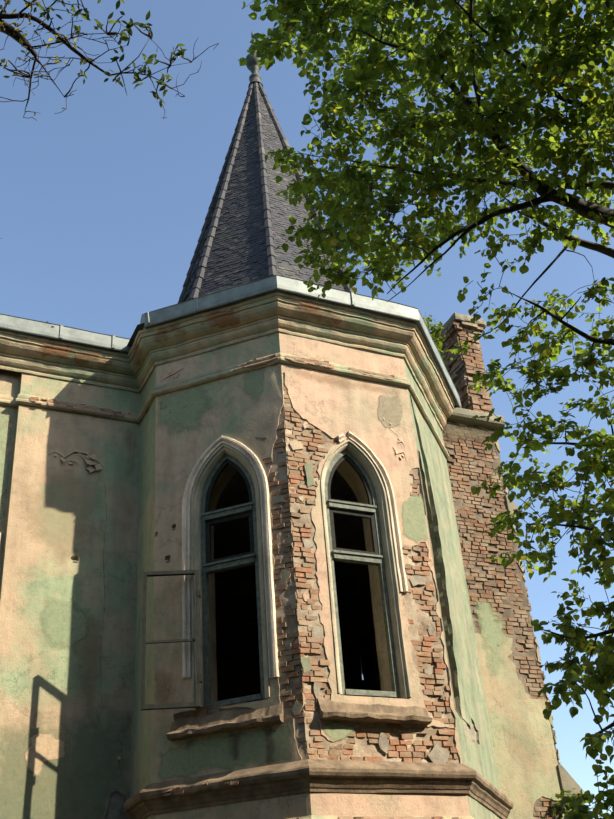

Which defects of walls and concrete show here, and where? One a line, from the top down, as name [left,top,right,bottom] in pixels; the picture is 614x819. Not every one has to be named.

flaking render [256,373,460,763]
flaking render [442,421,550,702]
flaking render [533,796,561,819]